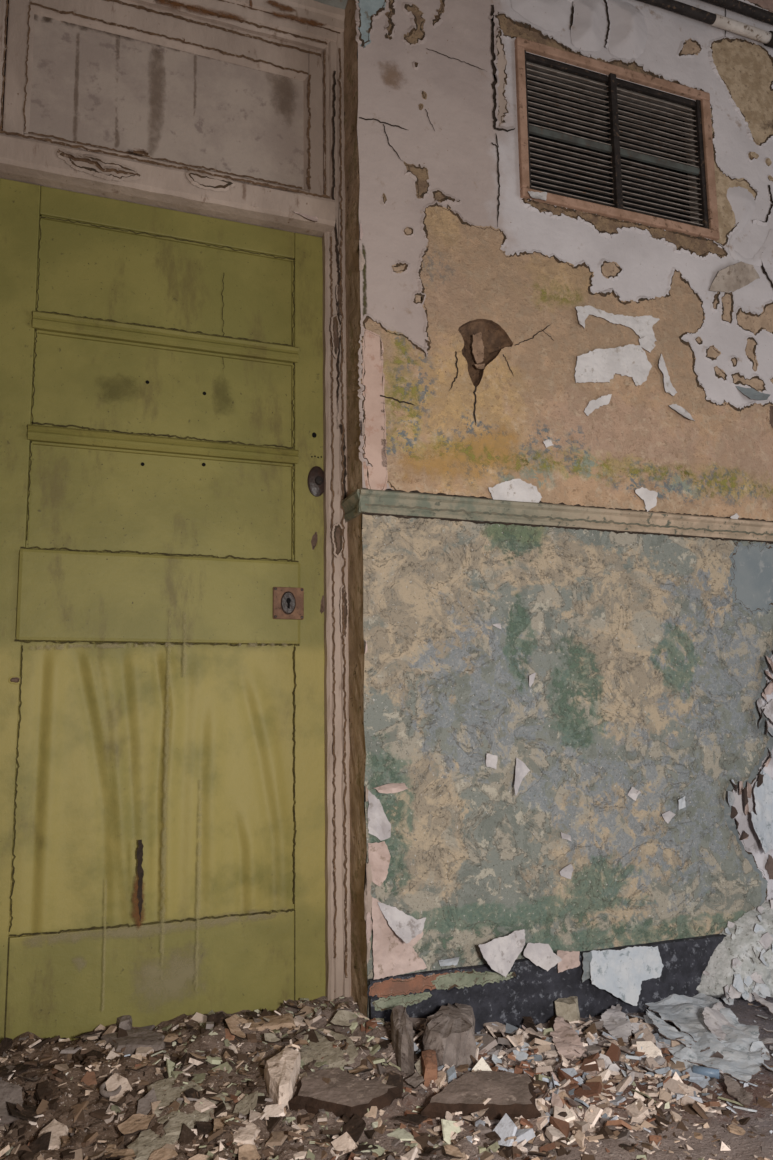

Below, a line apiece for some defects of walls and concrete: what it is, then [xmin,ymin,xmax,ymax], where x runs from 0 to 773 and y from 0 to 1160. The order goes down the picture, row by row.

peeling [355,0,447,50]
crack [332,71,435,521]
peeling [357,11,773,521]
crack [503,323,554,376]
crack [449,351,477,423]
peeling [486,753,498,769]
peeling [514,757,530,796]
peeling [662,796,686,824]
peeling [696,649,773,1005]
peeling [364,783,562,1014]
peeling [559,864,574,879]
peeling [582,946,664,1006]